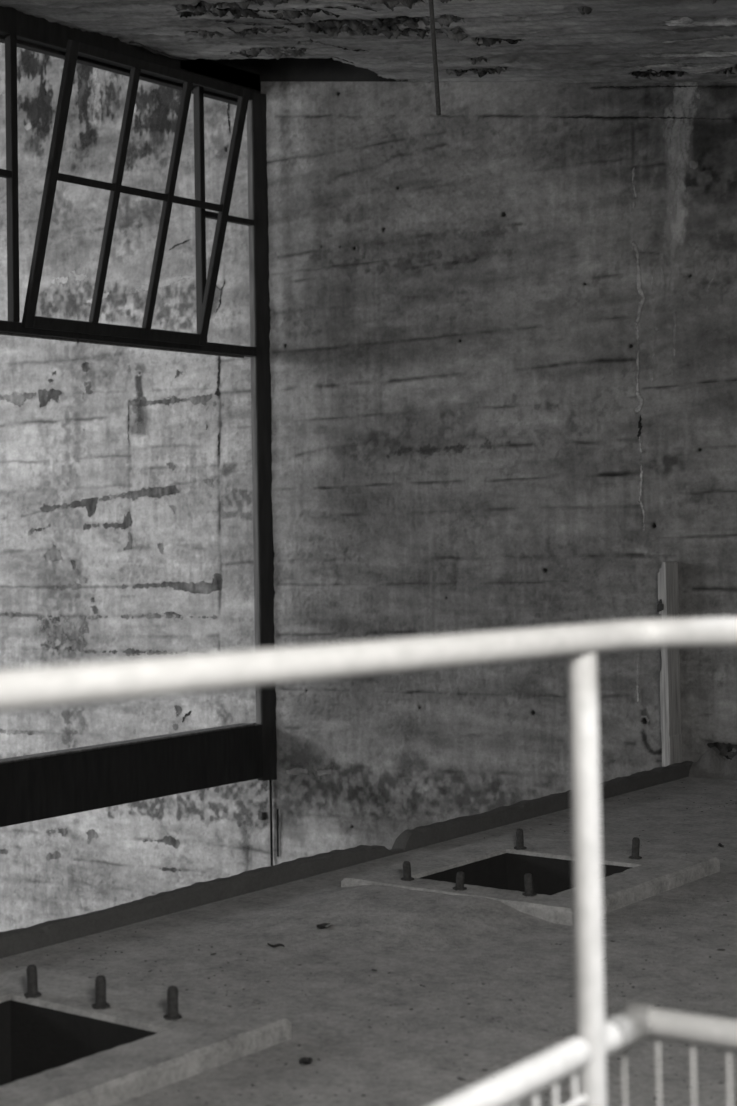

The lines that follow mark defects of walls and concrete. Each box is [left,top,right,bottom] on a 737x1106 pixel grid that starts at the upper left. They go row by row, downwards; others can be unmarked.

spalling [175,0,525,78]
spalling [631,69,684,80]
leakage [664,82,737,242]
crack [635,415,643,439]